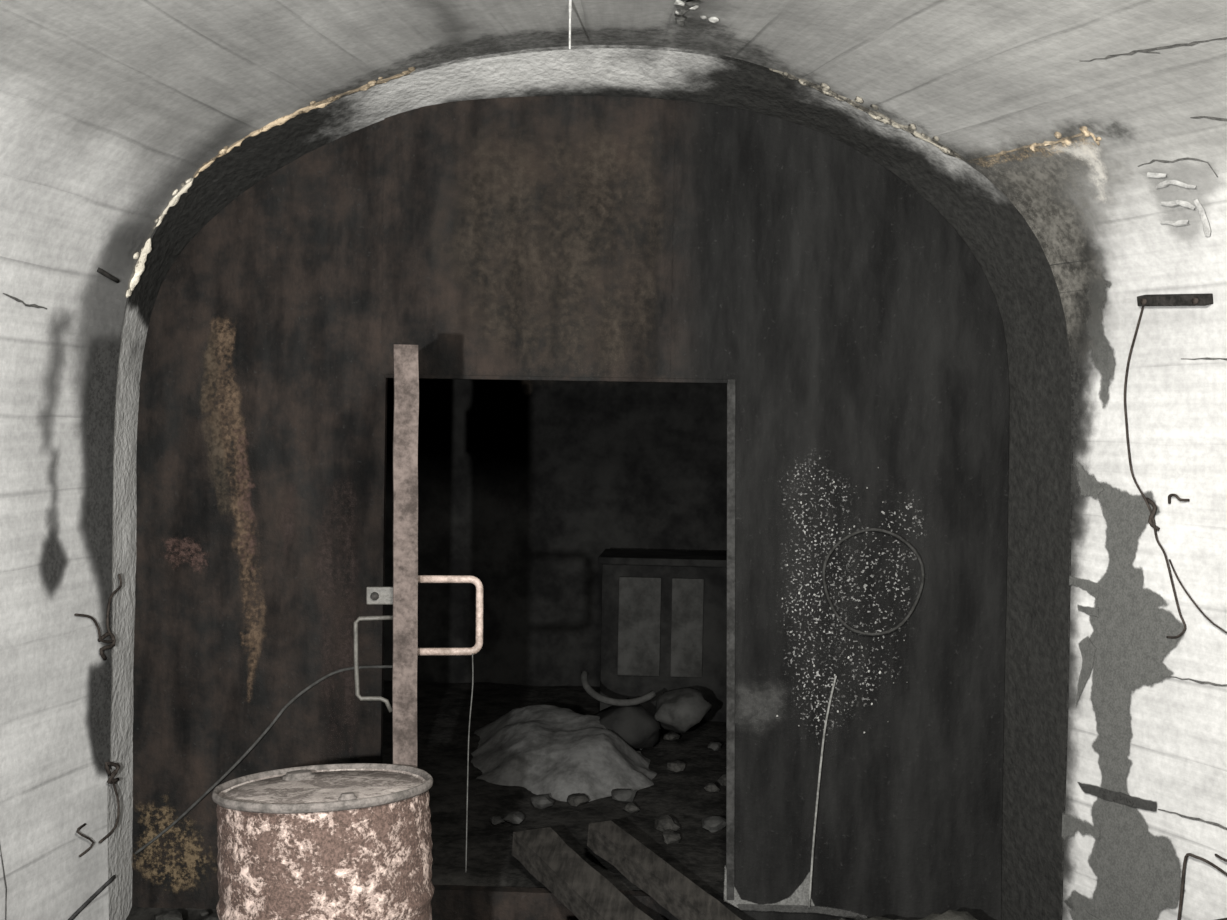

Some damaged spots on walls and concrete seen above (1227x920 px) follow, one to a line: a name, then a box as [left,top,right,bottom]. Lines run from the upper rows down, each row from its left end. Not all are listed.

crack [1089,37,1227,61]
spalling [126,67,415,298]
spalling [769,68,1104,333]
damp [1085,270,1115,408]
rust [201,321,262,681]
damp [782,468,916,729]
rust [138,807,206,891]